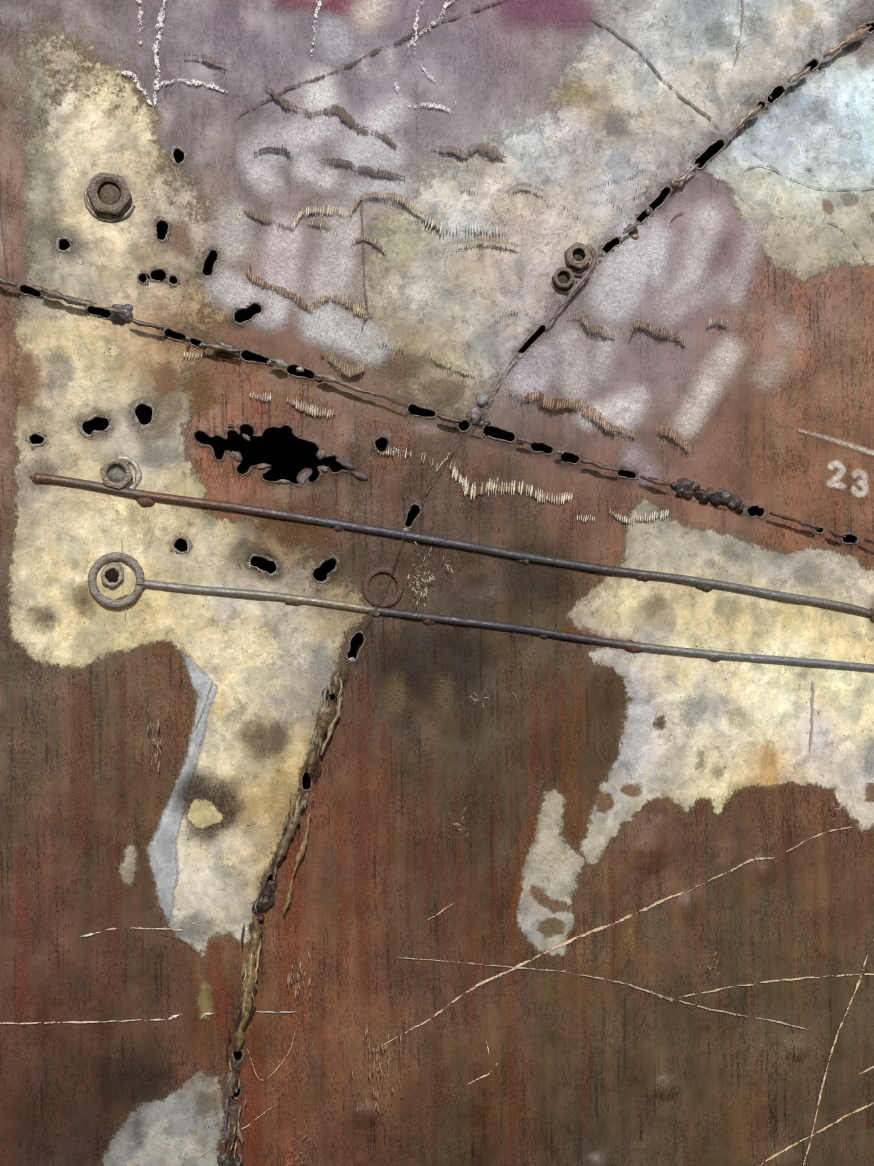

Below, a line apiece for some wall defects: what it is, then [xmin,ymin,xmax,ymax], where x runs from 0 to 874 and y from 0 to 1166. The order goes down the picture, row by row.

crack [735,0,745,63]
crack [590,16,720,129]
peeling [695,25,874,282]
crack [744,152,874,190]
spalling [518,328,543,353]
peeling [7,14,372,958]
corrosion [653,715,665,729]
peeling [515,494,874,957]
corrosion [594,784,642,813]
corrosion [865,783,874,801]
corrosion [530,886,570,938]
peeling [102,1070,239,1166]